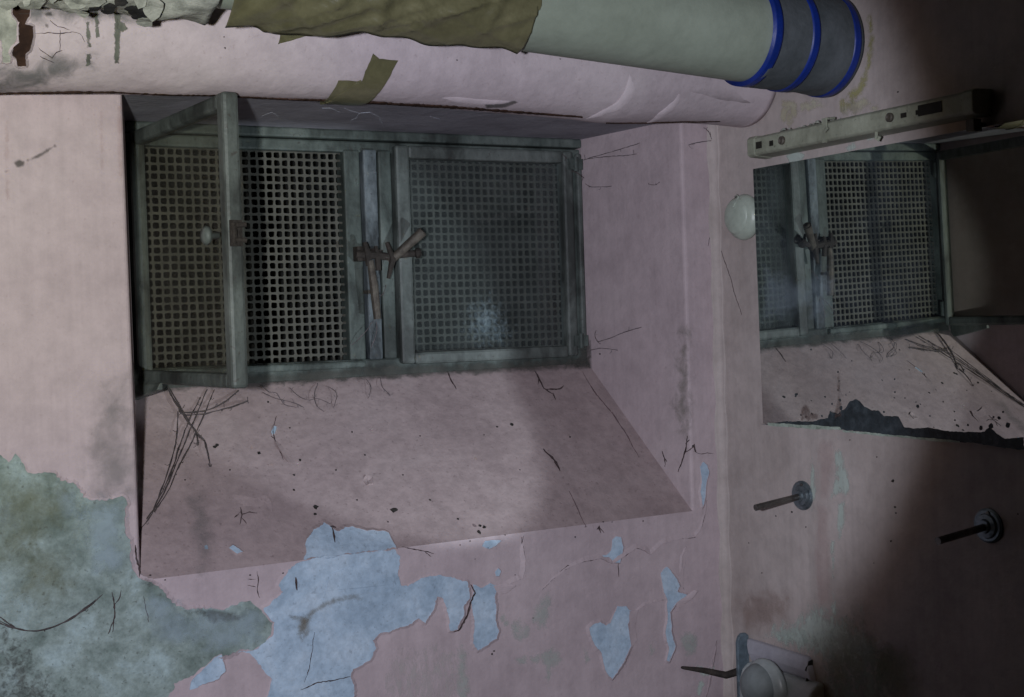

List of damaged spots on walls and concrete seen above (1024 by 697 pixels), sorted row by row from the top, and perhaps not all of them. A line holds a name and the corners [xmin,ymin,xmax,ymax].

flaking render [0,5,36,69]
flaking render [0,452,526,697]
peeling [585,605,638,681]
peeling [660,561,698,664]